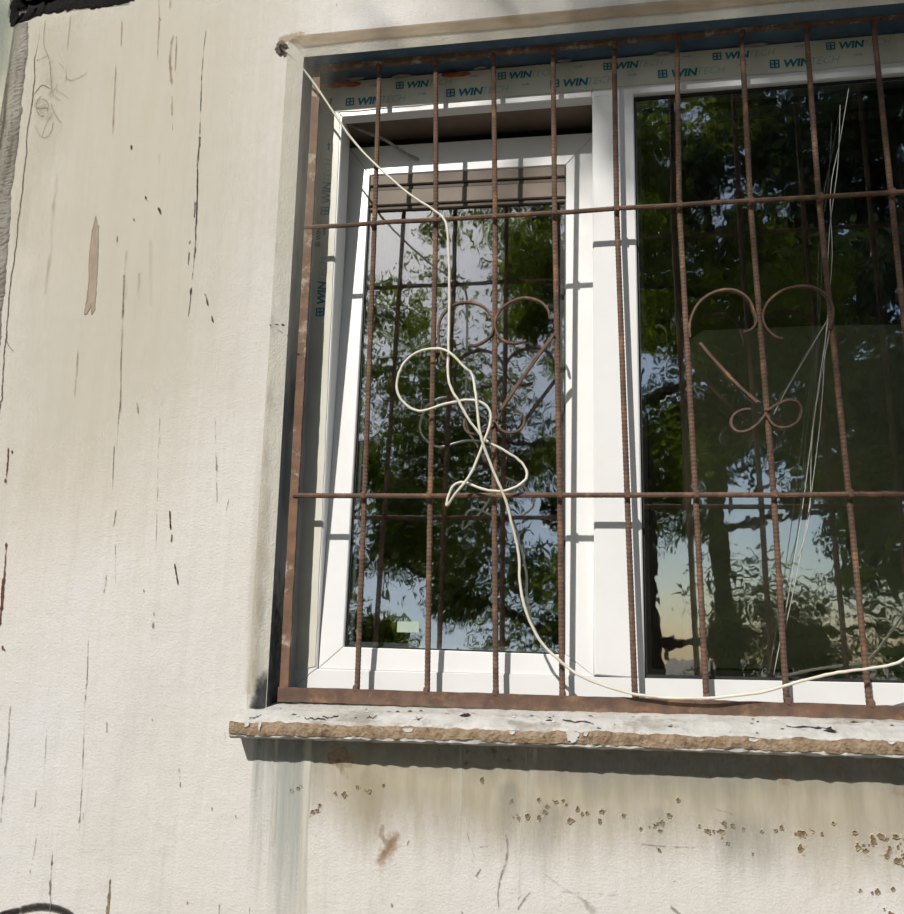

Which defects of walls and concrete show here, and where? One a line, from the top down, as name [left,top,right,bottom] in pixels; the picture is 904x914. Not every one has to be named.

crack [0,16,87,408]
spalling [229,721,904,766]
leakage [272,739,904,897]